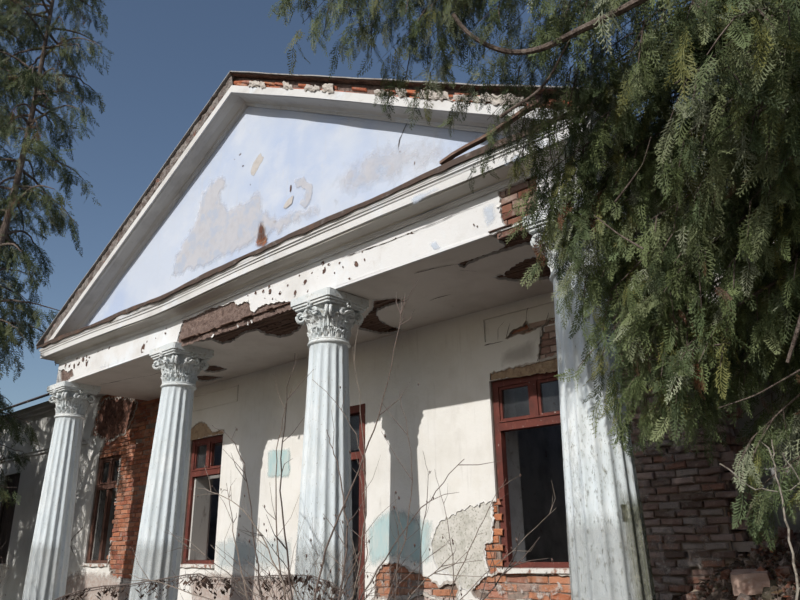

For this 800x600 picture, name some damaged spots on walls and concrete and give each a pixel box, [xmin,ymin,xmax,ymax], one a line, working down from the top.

spalling [232,78,571,110]
peeling [174,178,312,274]
spalling [177,261,343,346]
spalling [357,298,408,335]
spalling [457,175,539,268]
spalling [491,255,551,282]
spalling [490,317,558,380]
spalling [190,421,224,441]
flaking render [607,246,740,600]
spalling [64,395,160,600]
peeling [371,498,572,600]